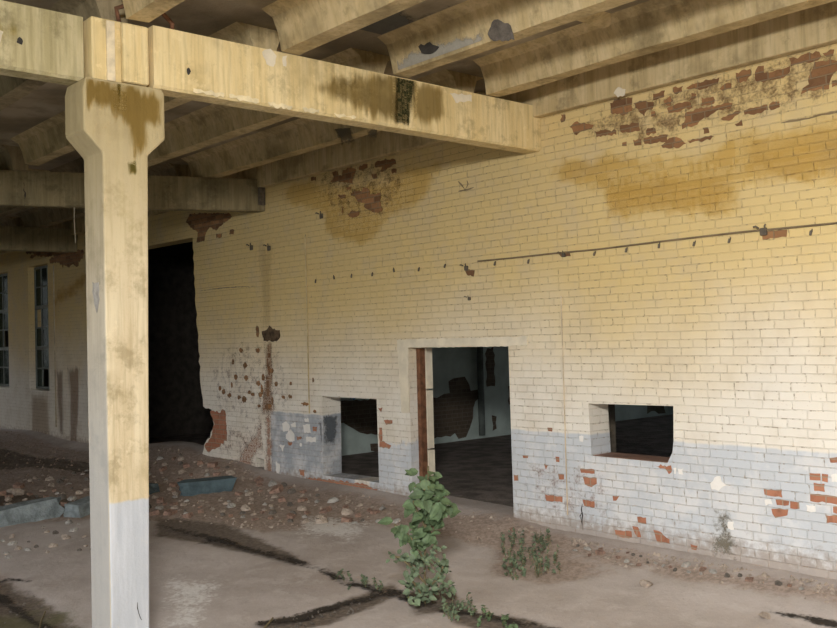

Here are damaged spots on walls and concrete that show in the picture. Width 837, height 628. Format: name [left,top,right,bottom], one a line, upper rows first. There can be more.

flaking render [560,49,837,149]
flaking render [331,159,400,218]
flaking render [186,213,234,242]
spalling [256,326,280,353]
spalling [219,348,292,410]
corrosion [262,344,274,413]
flaking render [205,409,244,452]
peeling [279,402,317,451]
flaking render [545,494,563,507]
flaking render [580,469,597,487]
flaking render [764,473,837,523]
flaking render [615,517,646,538]